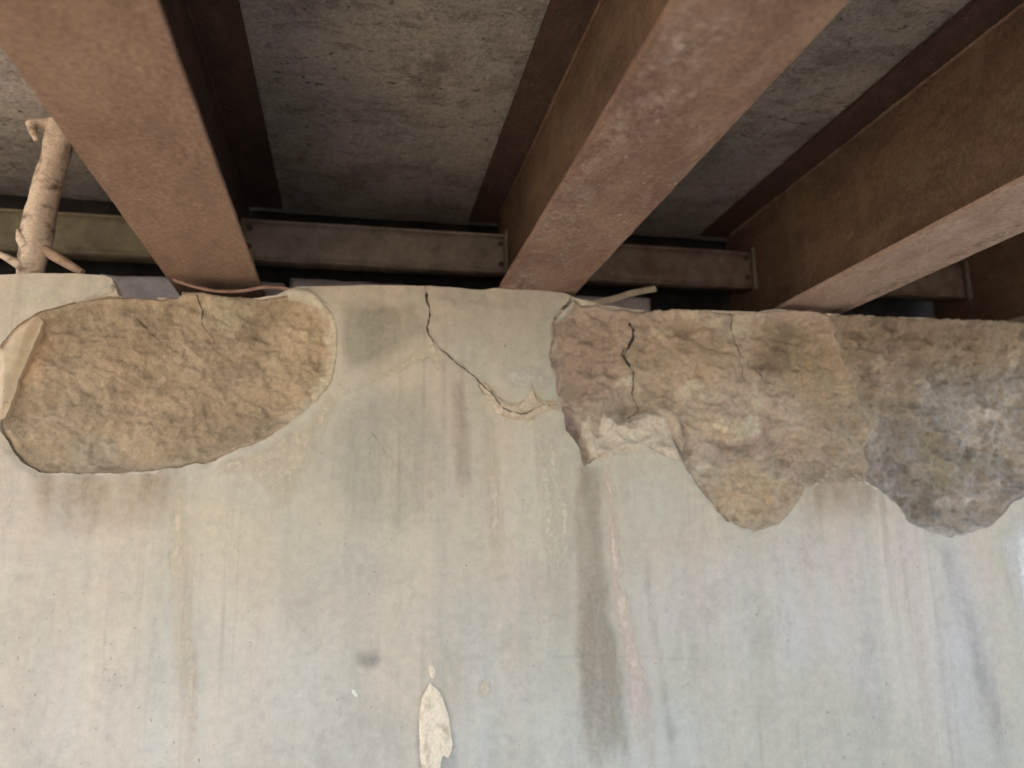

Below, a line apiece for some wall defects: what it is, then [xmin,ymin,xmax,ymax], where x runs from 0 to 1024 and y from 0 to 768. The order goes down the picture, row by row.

spalling [0,283,338,475]
crack [424,285,555,415]
crack [621,323,638,419]
spalling [549,299,1024,538]
peeling [419,665,453,768]